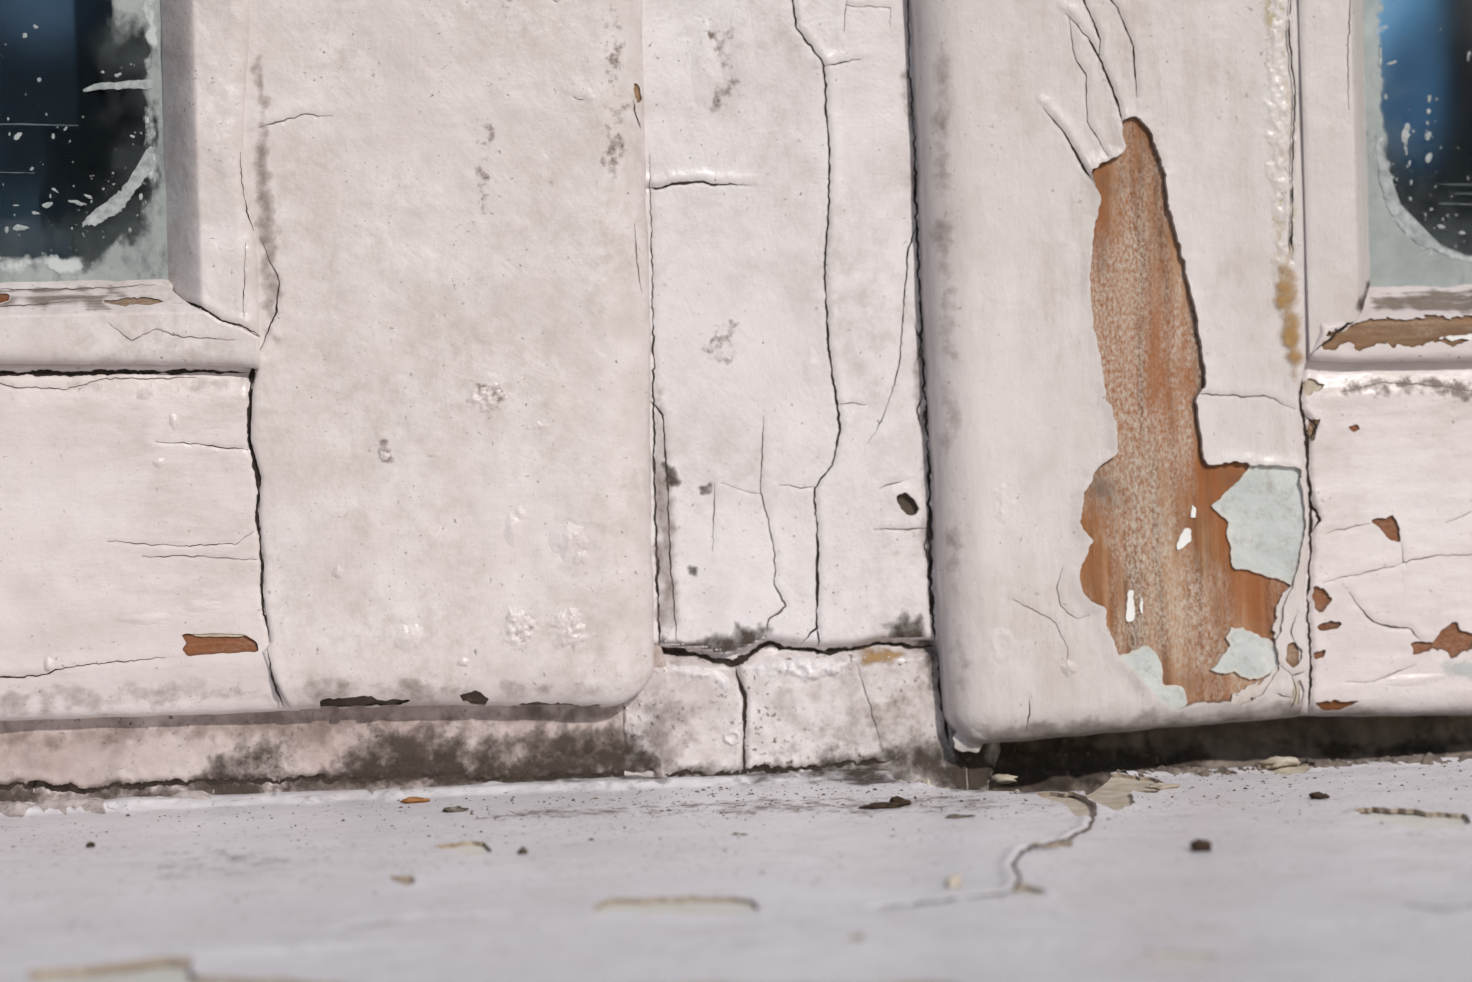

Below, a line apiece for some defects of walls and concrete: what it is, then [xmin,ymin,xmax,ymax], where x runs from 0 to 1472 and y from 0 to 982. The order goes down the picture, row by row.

crack [1045,0,1137,178]
peeling [1322,315,1472,351]
crack [0,113,333,704]
crack [475,0,949,783]
peeling [1080,117,1357,711]
peeling [182,633,258,656]
peeling [1411,622,1472,659]
leakage [0,781,41,802]
leakage [87,710,709,800]
leakage [681,739,1209,814]
leakage [1320,739,1472,758]
crack [882,794,1097,908]